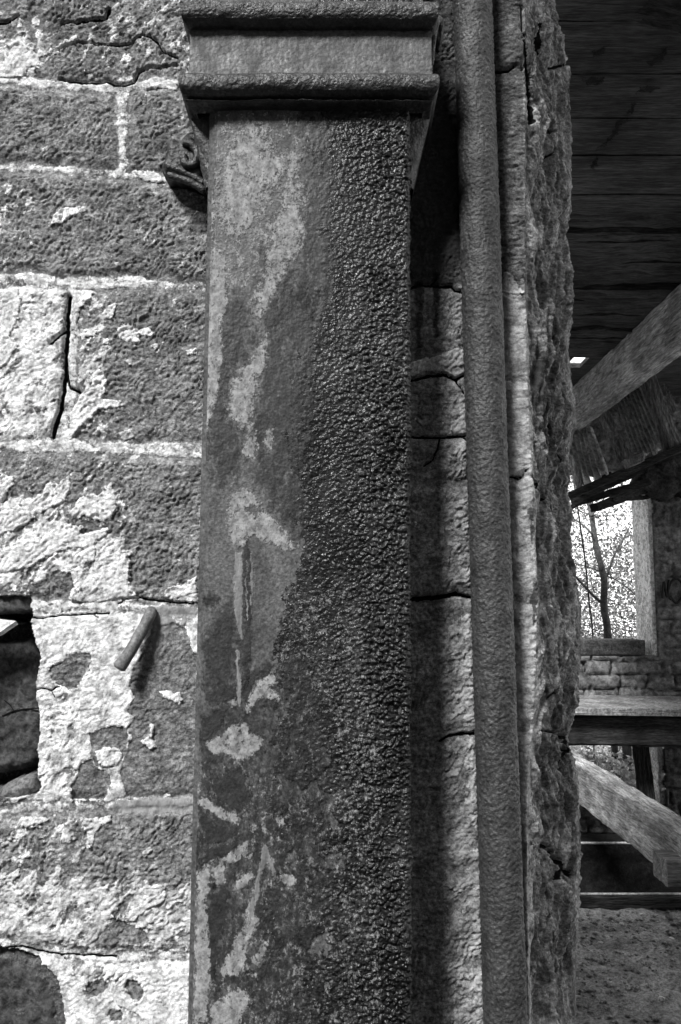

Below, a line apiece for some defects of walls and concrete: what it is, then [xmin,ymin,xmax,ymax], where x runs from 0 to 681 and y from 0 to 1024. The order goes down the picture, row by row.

crack [63,9,178,87]
crack [50,297,82,440]
water stain [205,286,284,491]
crack [32,596,195,619]
water stain [199,537,274,742]
crack [438,732,475,742]
water stain [211,766,251,811]
water stain [195,814,239,880]
crack [1,945,117,959]
water stain [206,885,231,984]